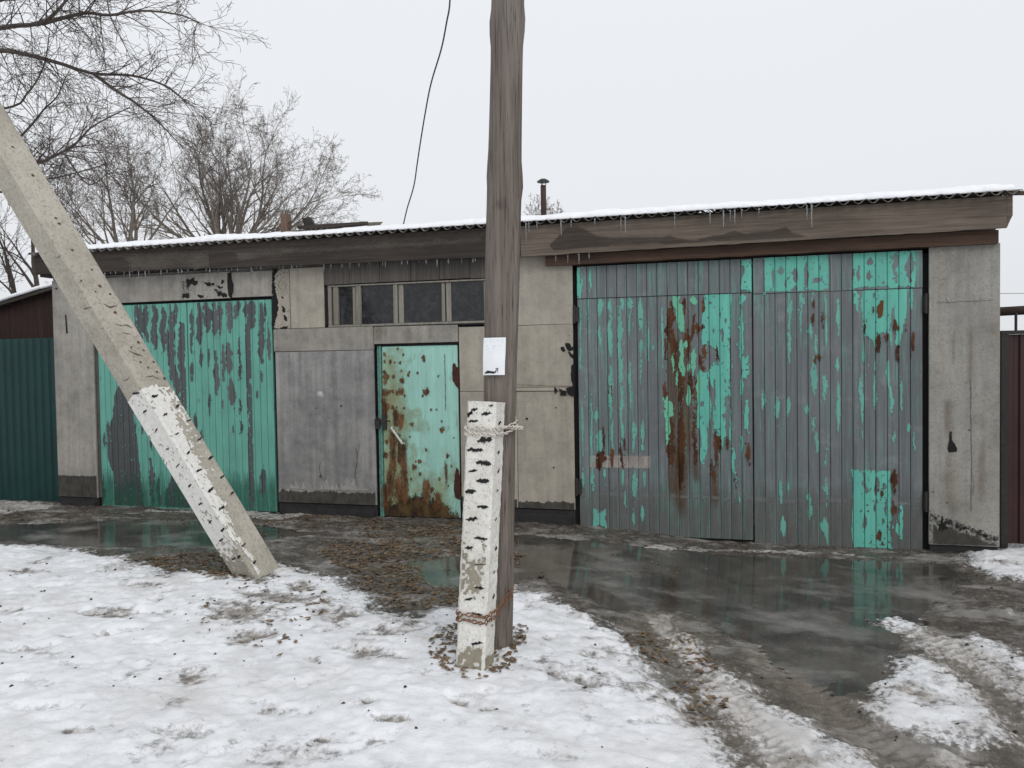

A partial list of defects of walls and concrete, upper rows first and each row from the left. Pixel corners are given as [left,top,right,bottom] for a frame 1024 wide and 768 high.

peeling [102,268,289,578]
corrosion [381,348,461,518]
corrosion [662,298,730,506]
peeling [554,255,841,502]
peeling [850,251,917,450]
corrosion [864,300,915,362]
peeling [593,508,607,528]
peeling [621,470,646,526]
peeling [778,477,790,537]
peeling [806,478,831,545]
peeling [849,469,903,549]